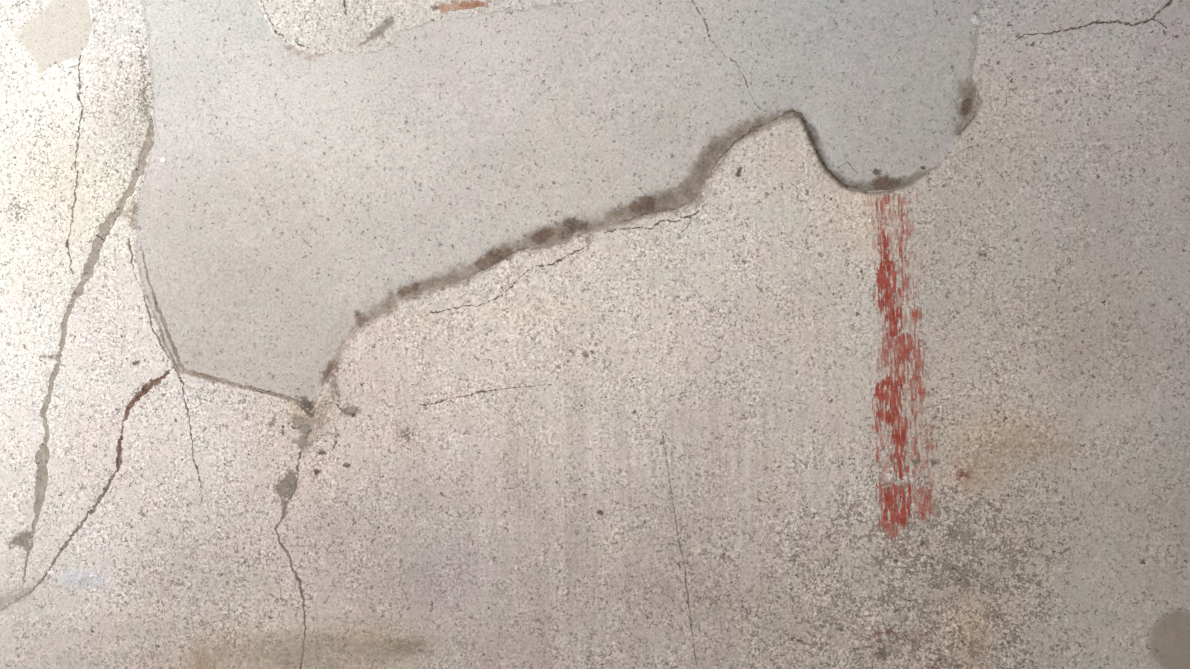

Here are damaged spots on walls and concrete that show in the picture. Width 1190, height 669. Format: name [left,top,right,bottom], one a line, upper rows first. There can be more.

crack [1016,0,1172,40]
crack [9,55,203,594]
spalling [141,250,337,518]
spalling [323,356,358,417]
spalling [351,109,925,332]
crack [274,457,306,669]